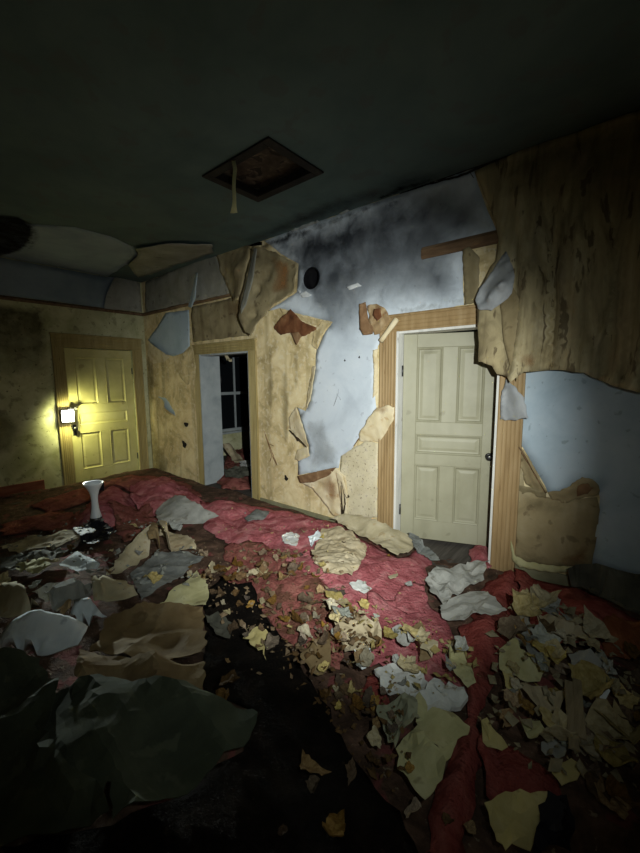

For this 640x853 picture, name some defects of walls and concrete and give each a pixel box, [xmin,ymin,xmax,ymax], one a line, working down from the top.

flaking render [0,224,138,276]
flaking render [148,310,196,385]
flaking render [264,169,496,475]